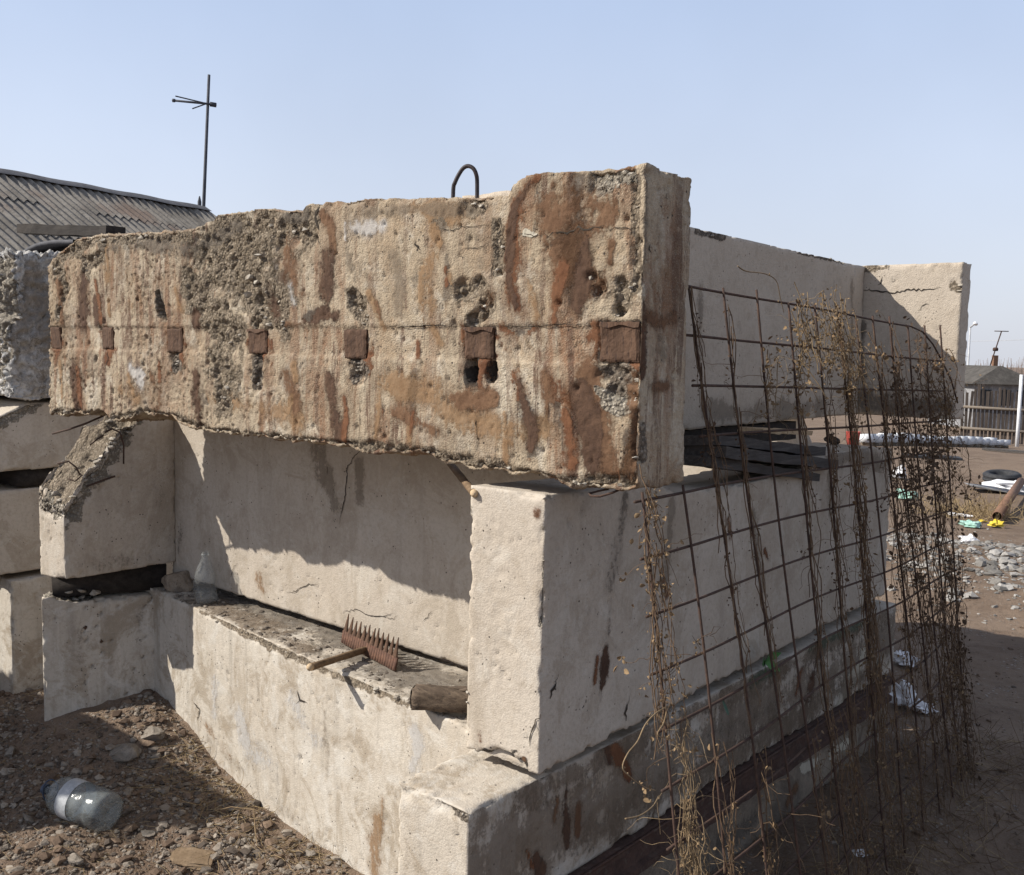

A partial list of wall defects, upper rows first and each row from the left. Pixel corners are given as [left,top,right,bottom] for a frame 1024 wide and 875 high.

spalling [589,169,643,317]
corrosion [55,276,64,326]
corrosion [51,339,83,411]
corrosion [76,248,111,335]
corrosion [103,343,118,367]
corrosion [174,287,201,331]
spalling [0,200,530,530]
corrosion [363,174,677,480]
crack [865,278,941,310]
crack [339,393,361,524]
spalling [546,285,969,875]
corrosion [593,645,610,695]